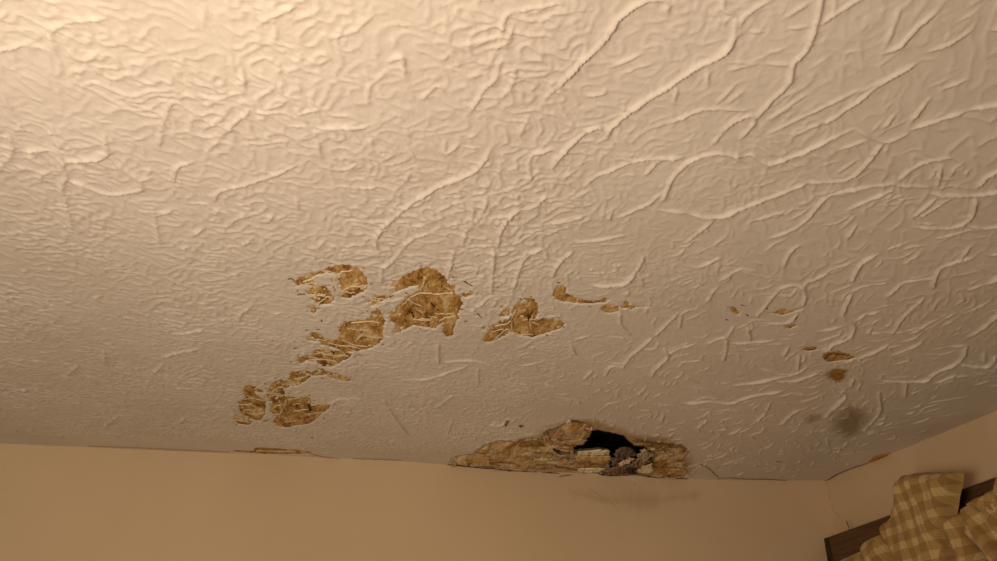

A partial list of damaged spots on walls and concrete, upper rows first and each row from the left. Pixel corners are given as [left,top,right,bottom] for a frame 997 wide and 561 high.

peeling [231,265,483,427]
peeling [477,296,565,342]
peeling [553,282,640,313]
spalling [448,419,689,479]